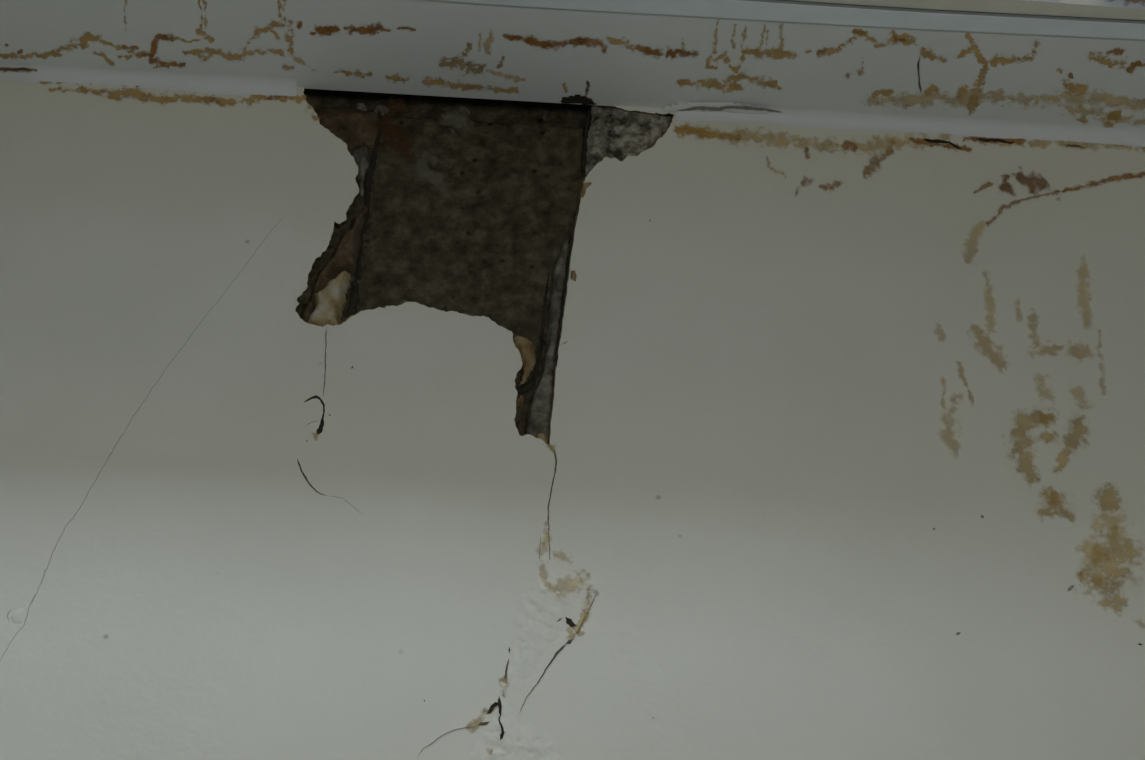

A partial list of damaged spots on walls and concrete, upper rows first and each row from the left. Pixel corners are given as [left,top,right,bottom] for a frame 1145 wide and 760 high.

damp [40,81,319,120]
damp [182,48,294,70]
damp [422,77,518,93]
damp [677,74,781,92]
damp [675,125,740,140]
damp [863,140,896,176]
crack [987,167,1145,225]
flaking render [295,89,781,445]
crack [0,220,281,661]
crack [297,327,362,514]
damp [1011,411,1086,483]
crack [539,444,557,570]